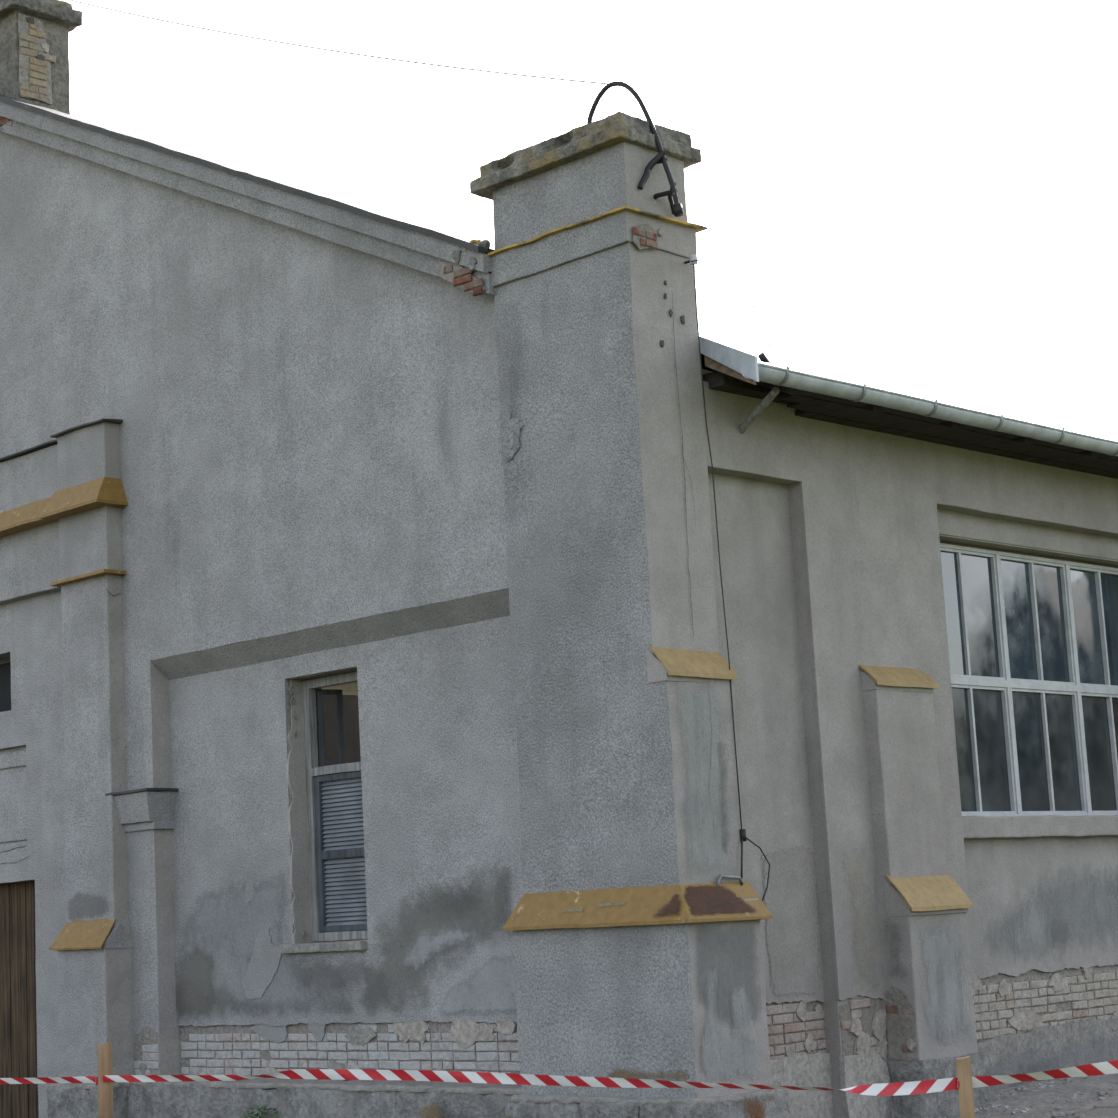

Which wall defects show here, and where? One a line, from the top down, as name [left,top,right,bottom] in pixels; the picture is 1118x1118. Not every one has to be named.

flaking render [434,239,490,296]
flaking render [633,224,664,250]
corrosion [655,885,756,917]
peeling [762,845,826,1060]
flaking render [180,1019,520,1083]
leakage [699,928,758,1078]
flaking render [839,986,919,1060]
flaking render [972,966,1118,1042]
corrosion [744,1098,771,1118]